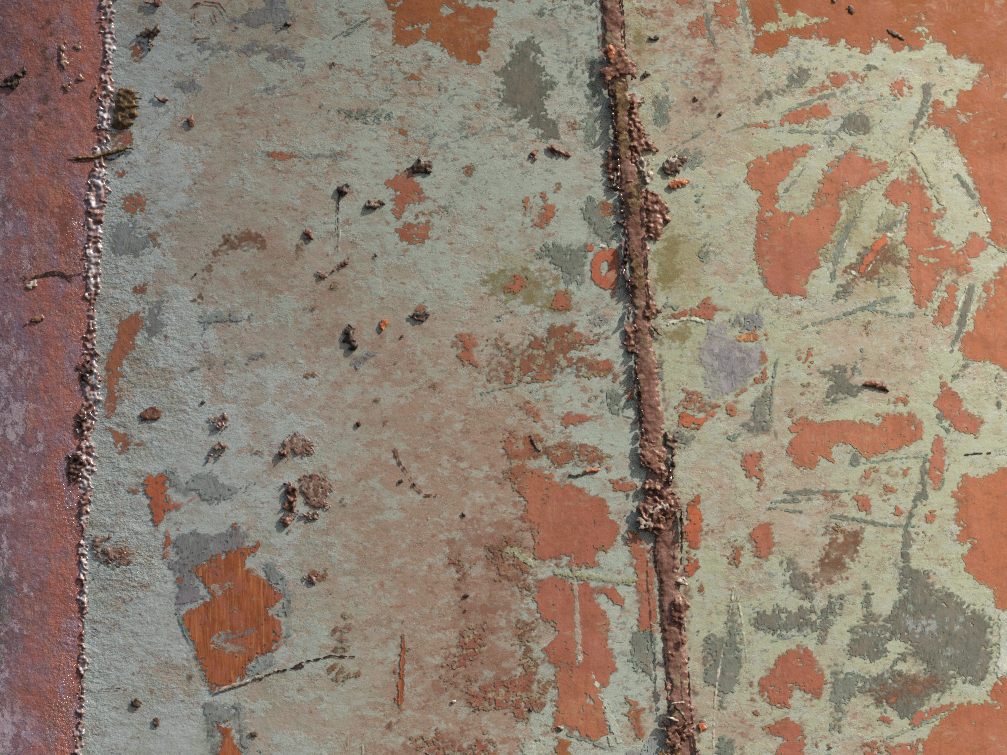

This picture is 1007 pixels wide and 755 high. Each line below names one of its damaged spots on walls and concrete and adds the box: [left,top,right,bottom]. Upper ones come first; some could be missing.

peeling [385,0,515,97]
peeling [337,183,350,196]
peeling [364,155,476,251]
peeling [316,257,349,289]
peeling [343,324,379,370]
peeling [408,300,430,322]
peeling [439,0,1007,755]
peeling [126,467,297,644]
peeling [203,636,278,755]
peeling [326,612,367,685]
peeling [386,619,411,729]
peeling [405,726,499,755]